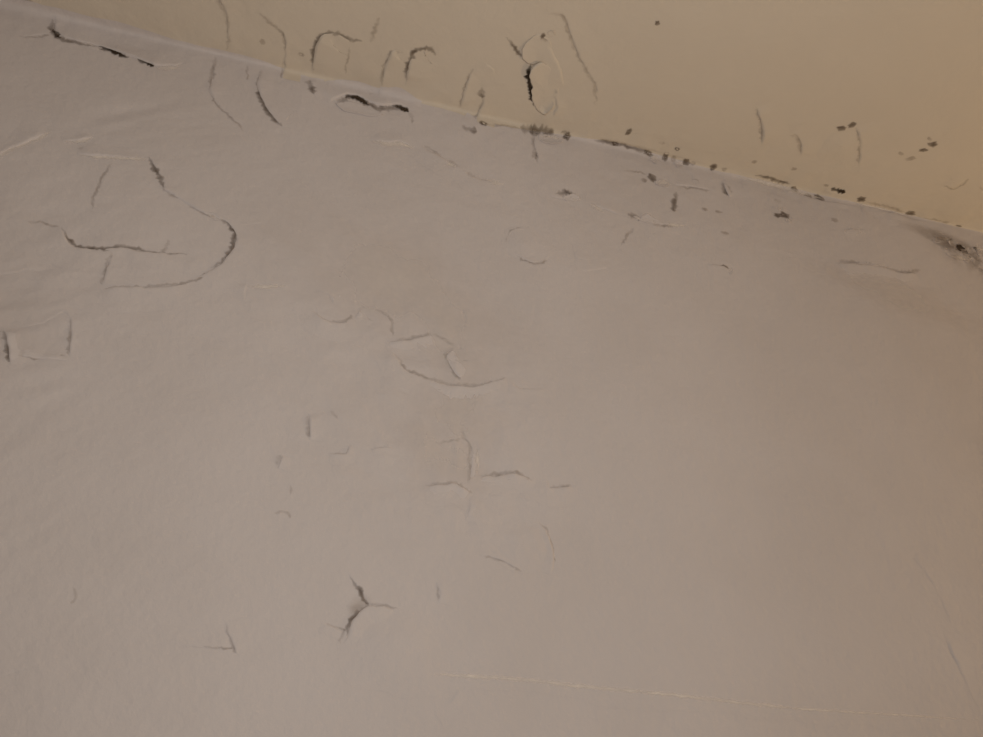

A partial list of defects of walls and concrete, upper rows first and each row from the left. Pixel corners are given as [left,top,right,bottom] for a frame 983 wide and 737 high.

crack [16,14,187,69]
crack [309,46,437,116]
crack [319,567,406,646]